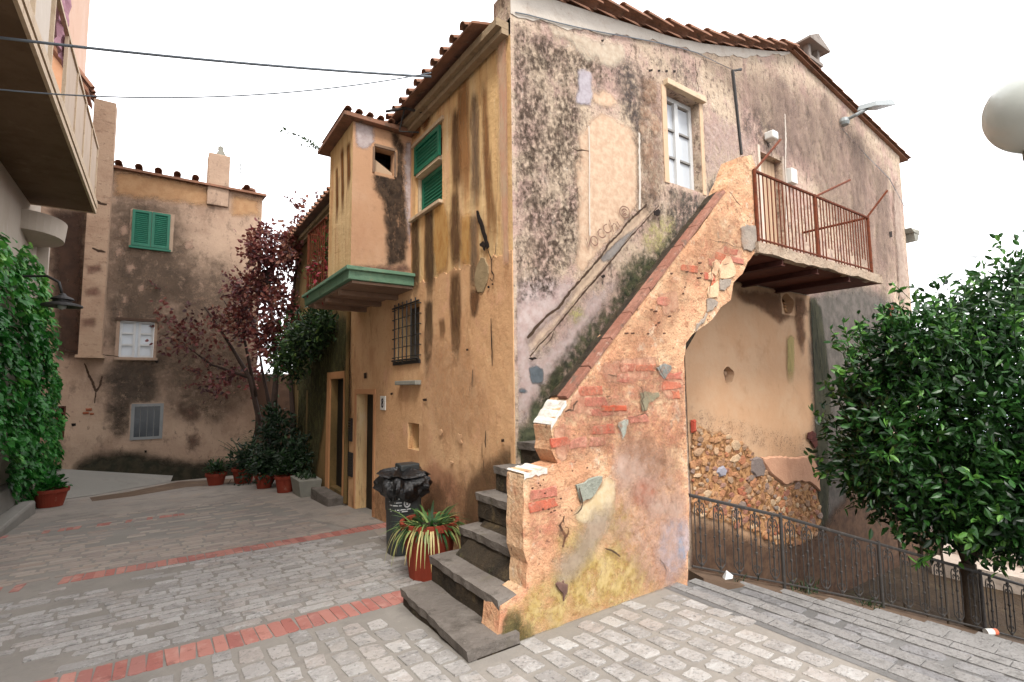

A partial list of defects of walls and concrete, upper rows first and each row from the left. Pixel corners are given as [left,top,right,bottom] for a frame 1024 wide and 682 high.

water stain [375,85,494,367]
water stain [515,31,714,413]
water stain [52,201,245,430]
flaking render [624,286,686,335]
flaking render [681,245,744,331]
water stain [76,452,238,481]
flaking render [528,479,562,513]
flaking render [550,357,684,472]
spalling [807,431,818,448]